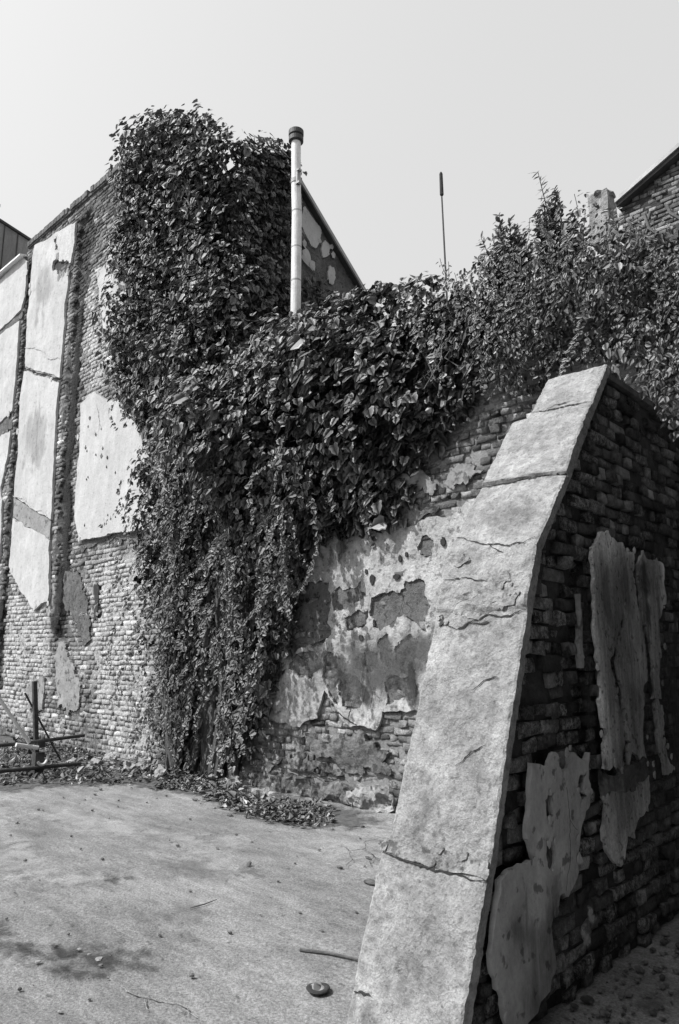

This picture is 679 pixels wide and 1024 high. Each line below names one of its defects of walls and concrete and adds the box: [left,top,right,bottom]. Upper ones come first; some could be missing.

peeling [96,242,140,348]
peeling [301,206,336,285]
peeling [0,223,100,646]
peeling [74,392,155,552]
crack [456,536,535,552]
peeling [247,457,520,777]
crack [443,577,526,630]
peeling [25,640,83,716]
peeling [379,530,675,1024]
crack [338,839,484,881]